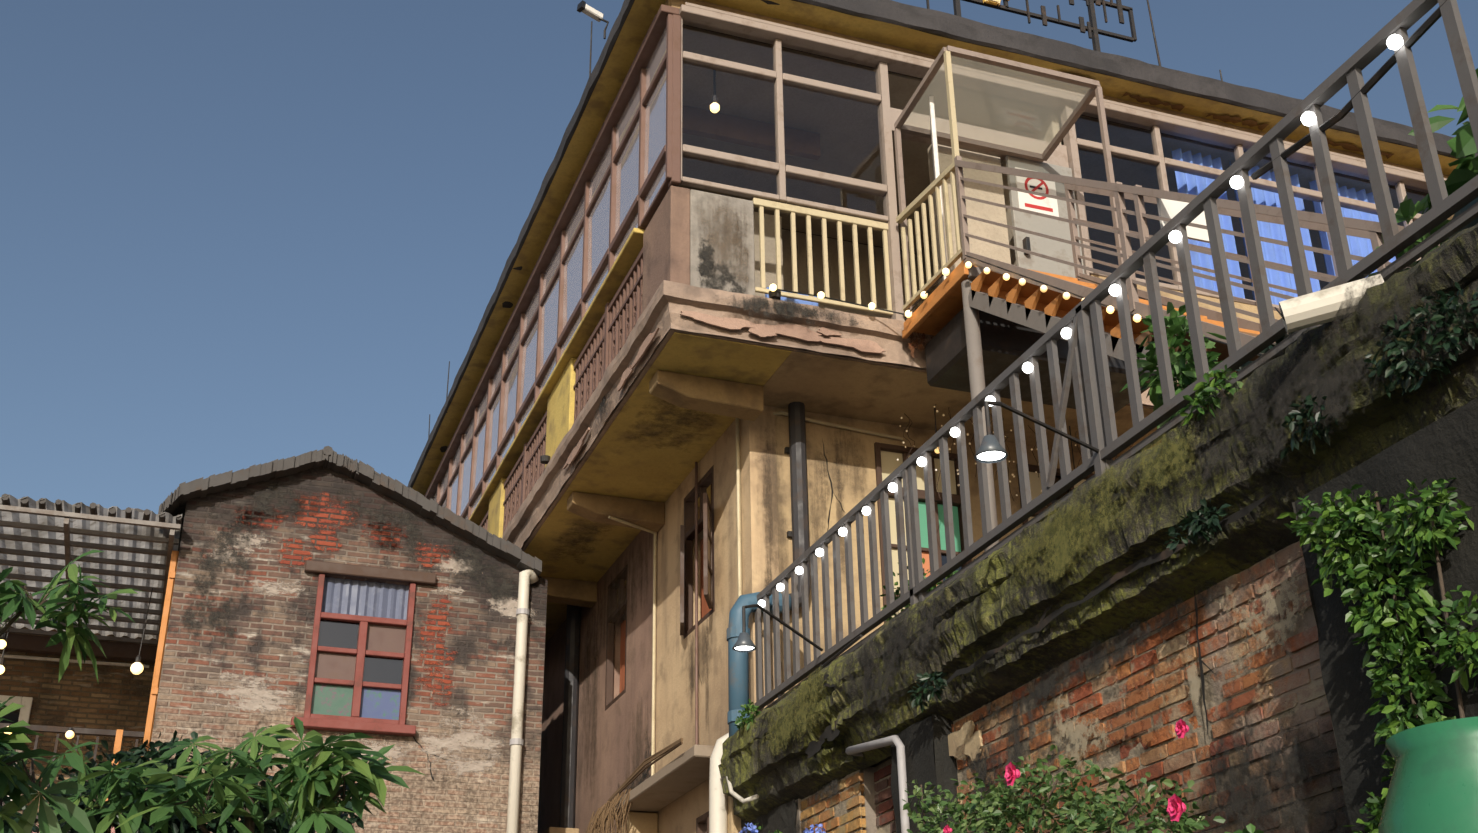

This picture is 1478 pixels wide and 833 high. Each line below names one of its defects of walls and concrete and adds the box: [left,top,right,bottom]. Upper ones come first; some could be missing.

damp [699,209,859,325]
damp [1032,515,1089,579]
crack [937,488,1273,686]
crack [1194,590,1215,733]
peeling [948,720,983,762]